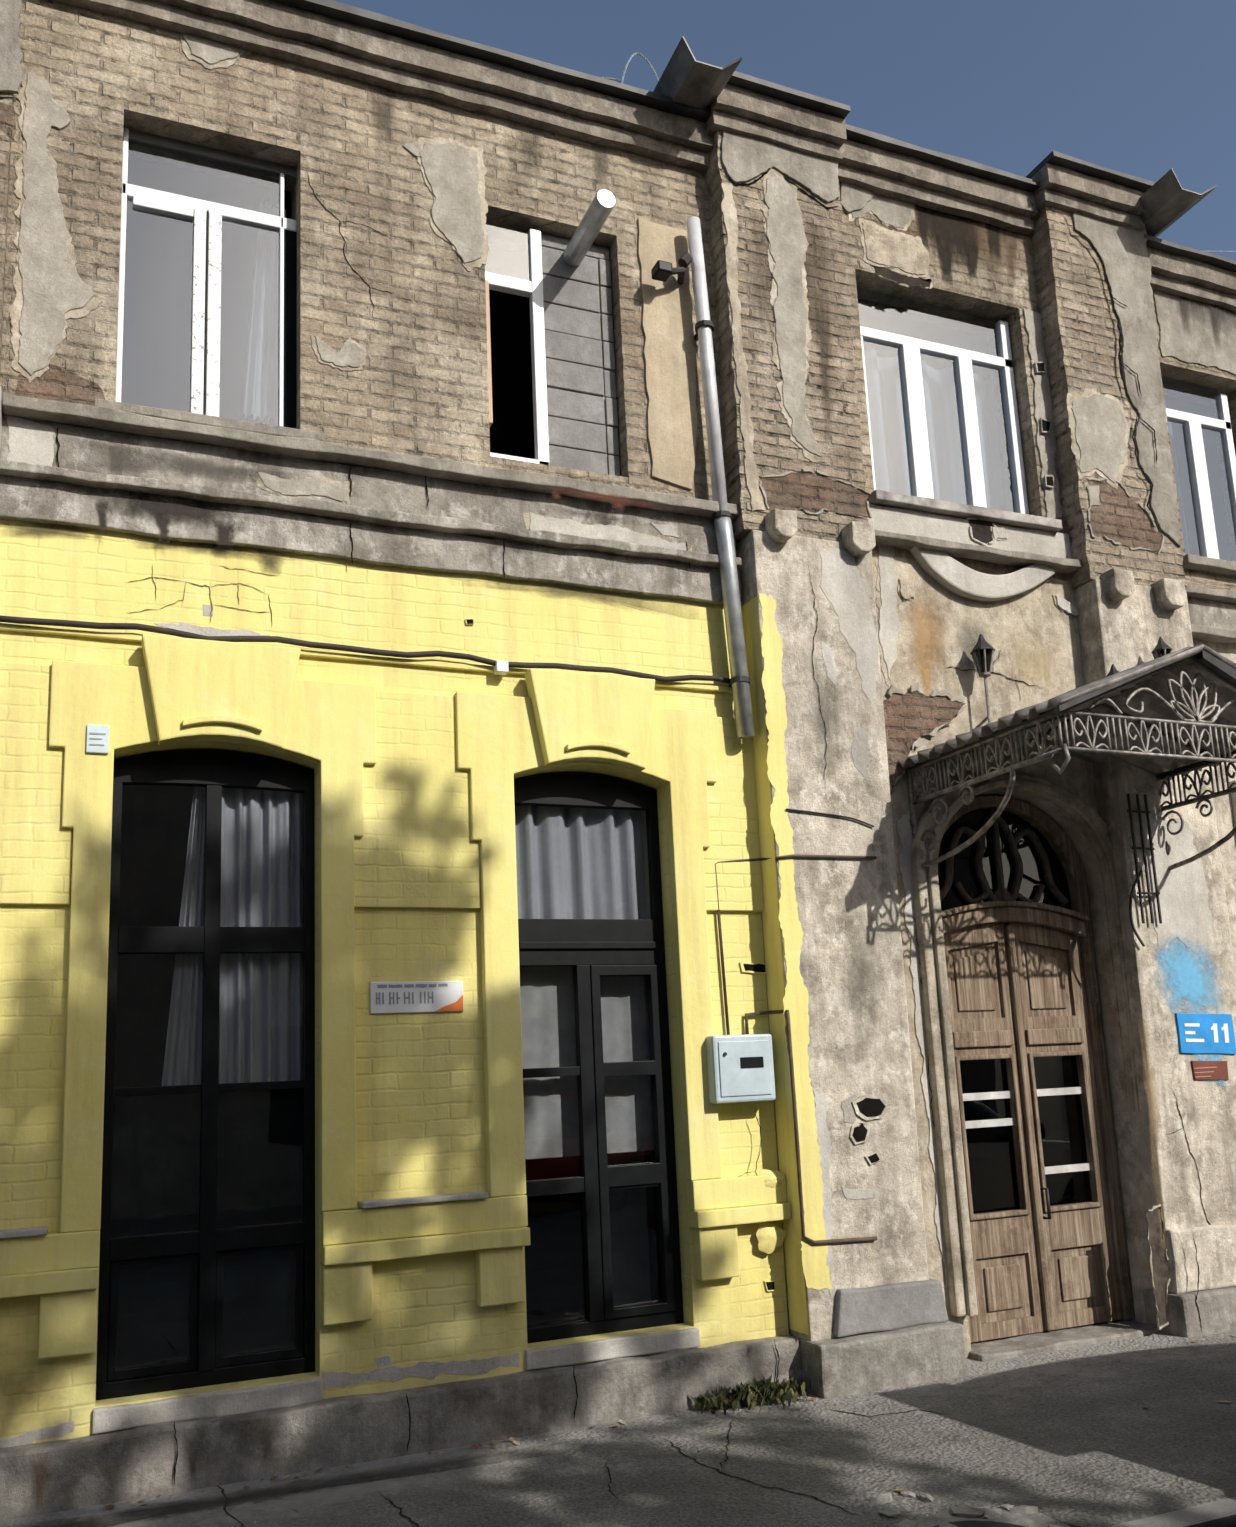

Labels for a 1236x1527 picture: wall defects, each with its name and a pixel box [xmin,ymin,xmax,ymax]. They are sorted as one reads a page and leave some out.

peeling [0,0,105,406]
damp [916,206,1014,282]
peeling [721,130,933,518]
crack [1070,214,1158,529]
peeling [1023,211,1236,555]
peeling [7,416,55,466]
damp [112,451,256,477]
damp [98,492,277,570]
crack [126,564,276,622]
peeling [820,545,967,795]
peeling [322,1353,519,1389]